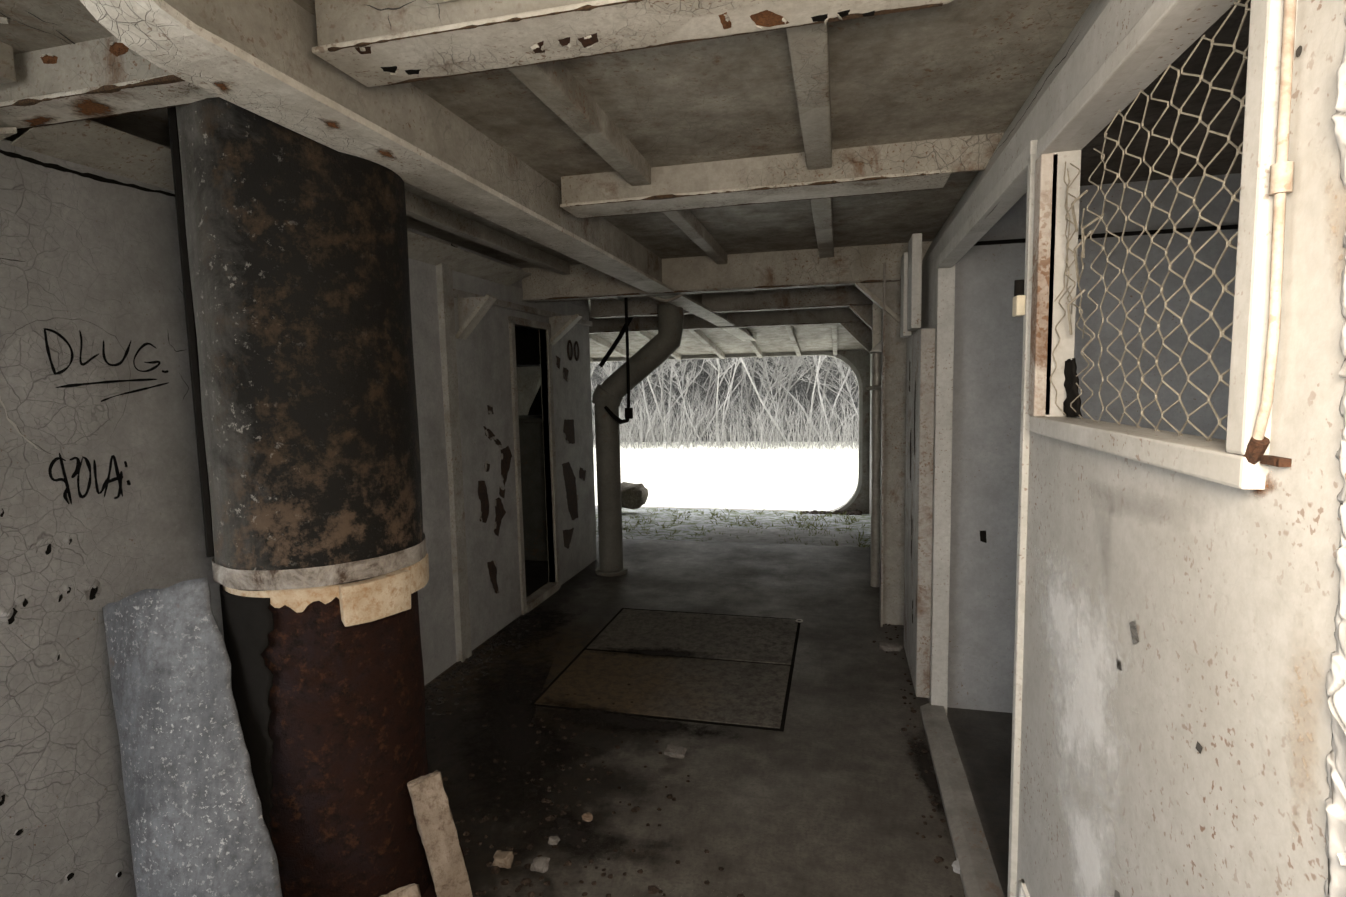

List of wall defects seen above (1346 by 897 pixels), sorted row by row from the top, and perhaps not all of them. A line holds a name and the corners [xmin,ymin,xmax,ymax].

rust [385,3,943,86]
rust [0,75,230,130]
crack [0,149,175,197]
peeling [478,405,512,536]
peeling [563,419,575,444]
peeling [562,462,587,549]
peeling [487,560,499,594]
damp [1042,575,1118,791]
damp [1065,801,1113,897]